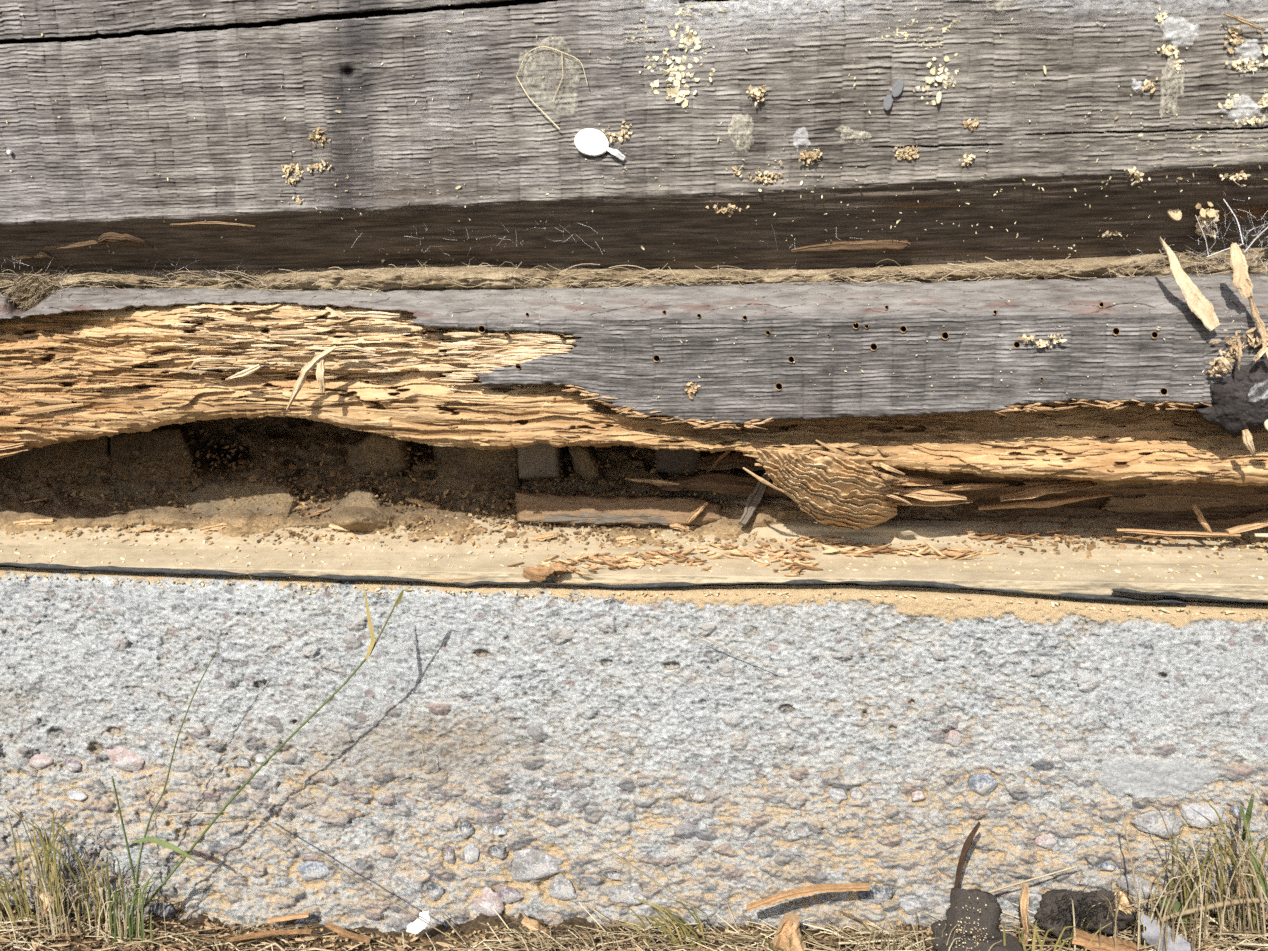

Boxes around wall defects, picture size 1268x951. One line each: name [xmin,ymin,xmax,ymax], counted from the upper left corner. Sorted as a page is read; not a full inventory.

crack [0,0,555,43]
peeling [0,442,32,457]
peeling [884,472,1112,510]